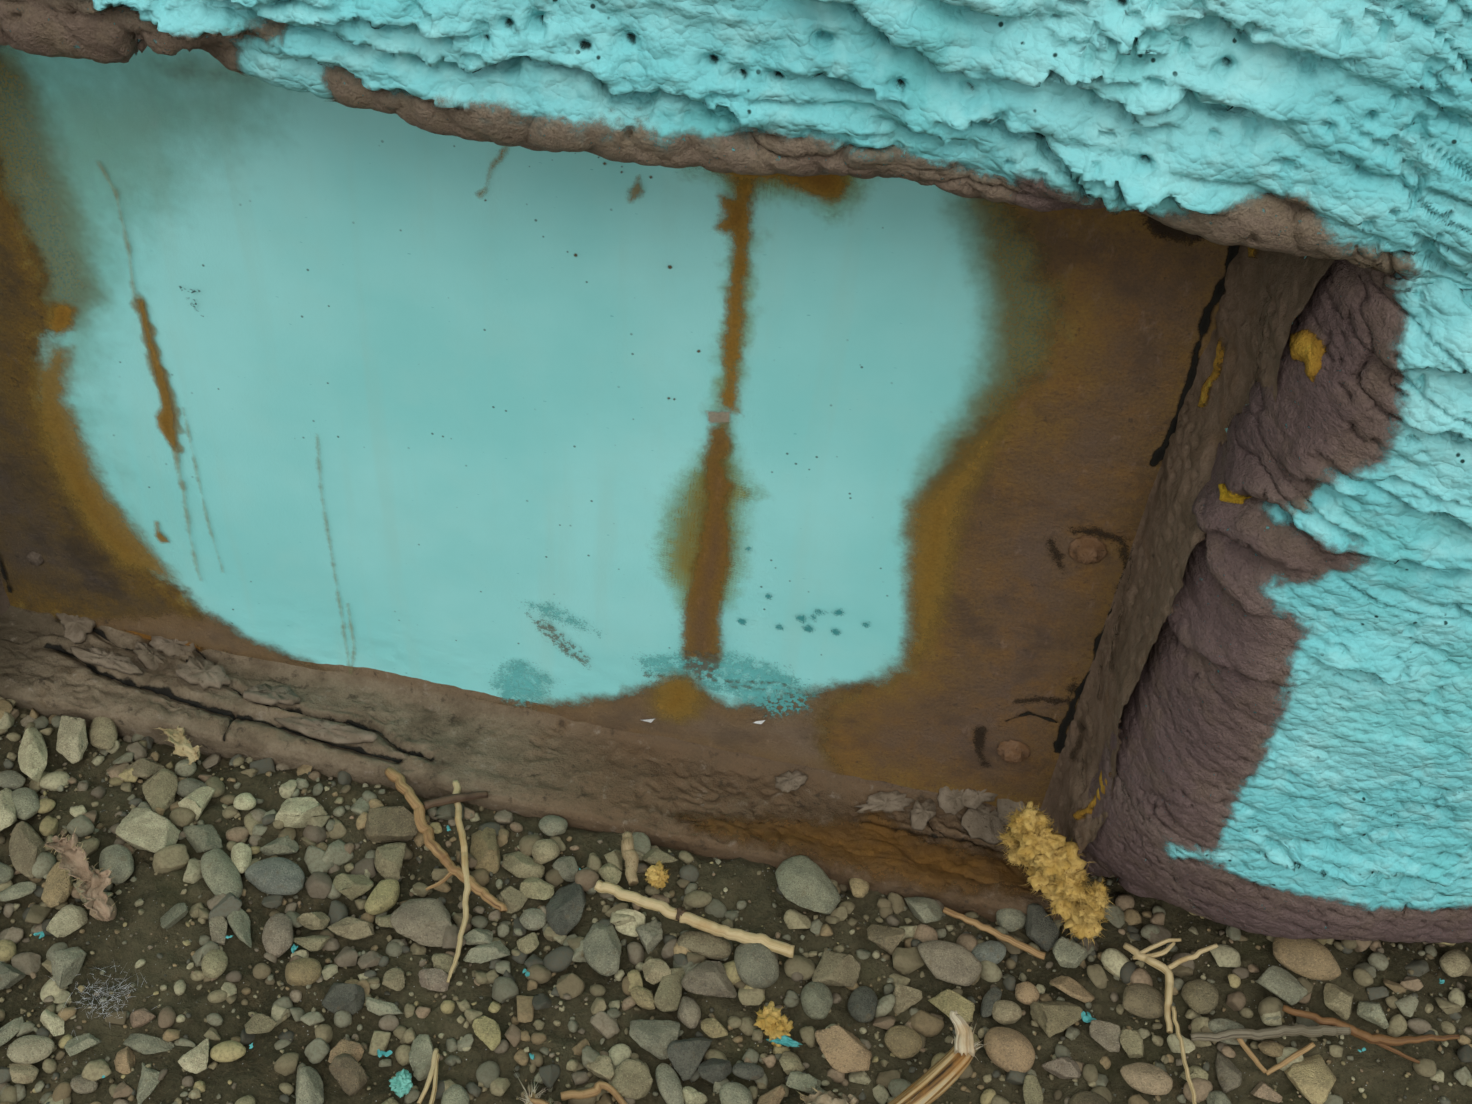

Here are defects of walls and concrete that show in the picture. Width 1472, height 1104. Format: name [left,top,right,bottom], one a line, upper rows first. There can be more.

corrosion [598,157,652,201]
spalling [1141,214,1204,246]
corrosion [0,50,329,671]
crack [1149,245,1240,467]
corrosion [499,172,1241,809]
peeling [56,613,378,744]
crack [973,526,1134,768]
peeling [775,770,808,792]
peeling [961,789,1041,825]